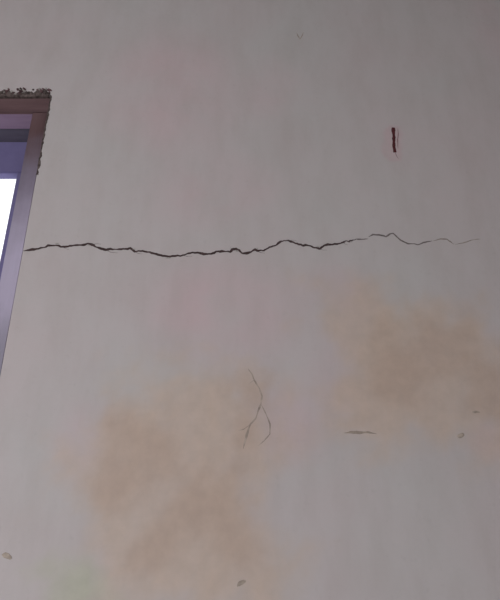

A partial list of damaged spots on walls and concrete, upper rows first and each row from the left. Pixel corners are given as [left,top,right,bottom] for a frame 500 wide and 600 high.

spalling [0,87,52,175]
rust [378,123,406,164]
crack [23,233,477,259]
water stain [6,255,500,600]
crack [239,369,271,448]